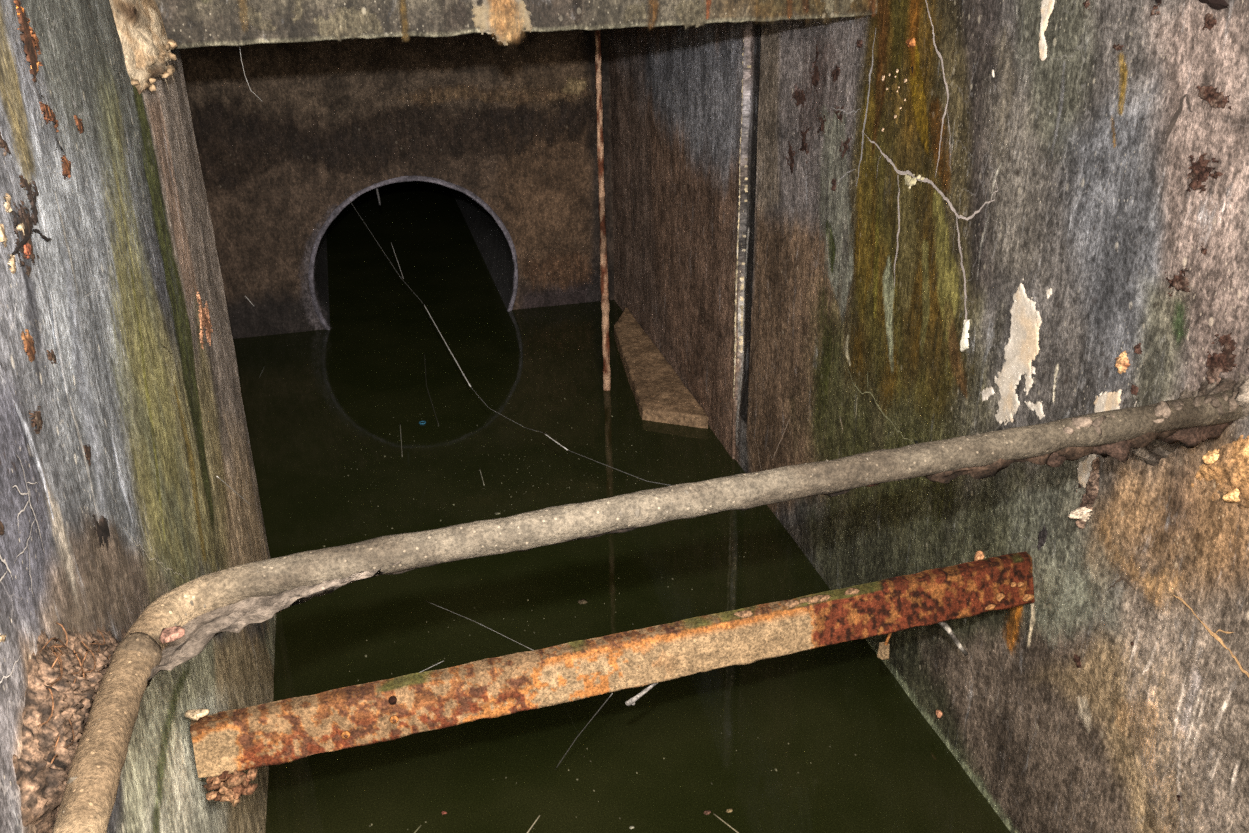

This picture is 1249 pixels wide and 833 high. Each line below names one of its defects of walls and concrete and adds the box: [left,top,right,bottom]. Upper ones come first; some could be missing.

spalling [470,0,533,45]
peeling [1038,0,1055,61]
flaking render [1199,0,1229,31]
leakage [791,46,840,107]
crack [833,0,998,352]
leakage [786,105,853,316]
peeling [980,279,1052,425]
leakage [174,385,206,560]
rust [734,609,753,618]
rust [784,588,860,609]
rust [985,582,1035,650]